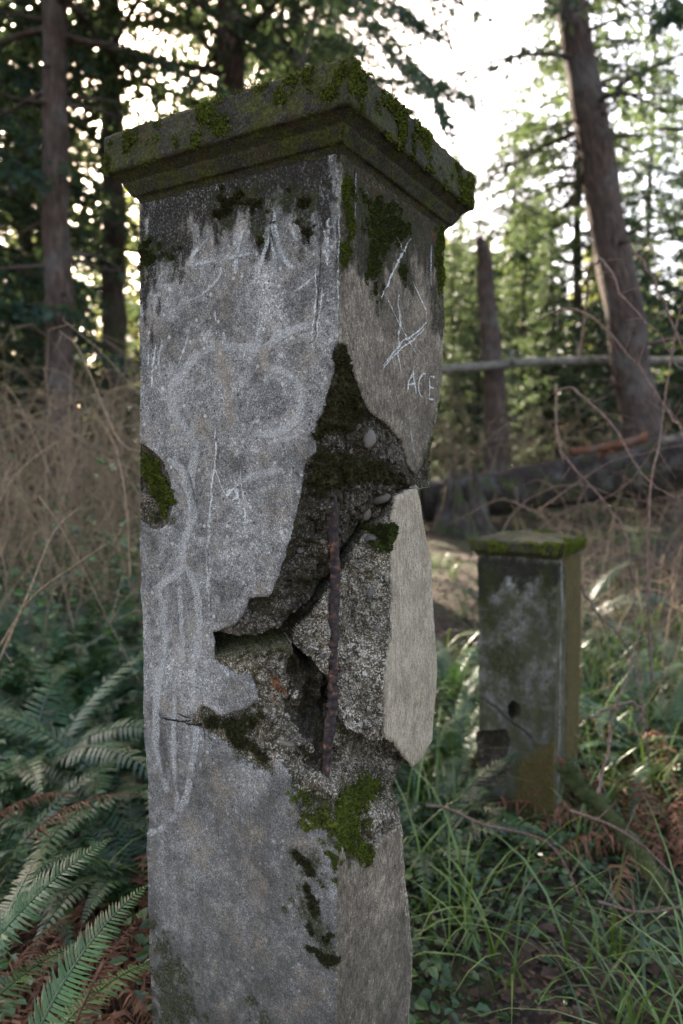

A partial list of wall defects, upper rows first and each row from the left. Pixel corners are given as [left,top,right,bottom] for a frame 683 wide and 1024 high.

leakage [139,153,445,370]
spalling [213,365,432,636]